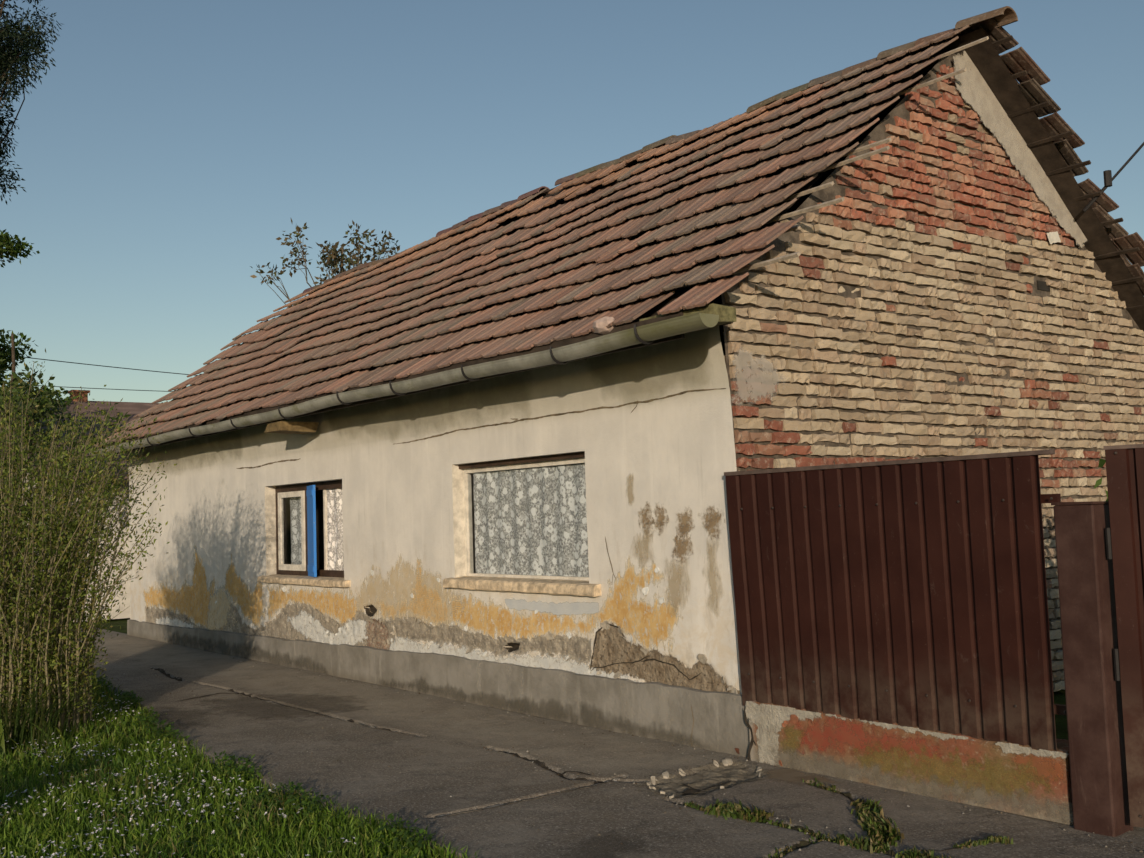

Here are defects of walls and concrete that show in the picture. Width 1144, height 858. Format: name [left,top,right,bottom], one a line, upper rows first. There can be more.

crack [397,388,726,444]
leakage [628,476,721,609]
crack [151,668,415,736]
crack [433,751,625,818]
spalling [144,546,969,799]
crack [744,708,756,761]
crack [672,777,1013,858]
spalling [995,742,1068,759]